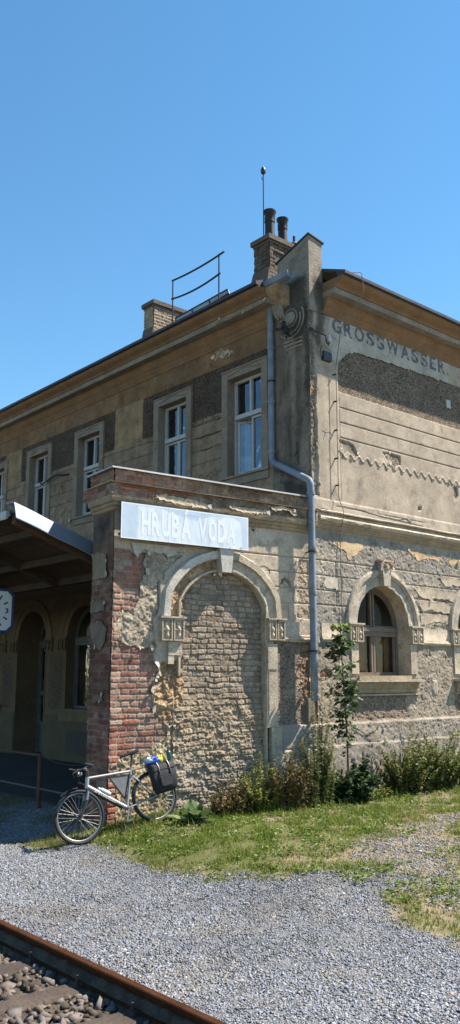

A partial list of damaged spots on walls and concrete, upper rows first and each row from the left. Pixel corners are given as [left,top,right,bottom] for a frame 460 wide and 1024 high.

peeling [333,542,363,560]
peeling [408,548,460,627]
flaking render [90,542,222,826]